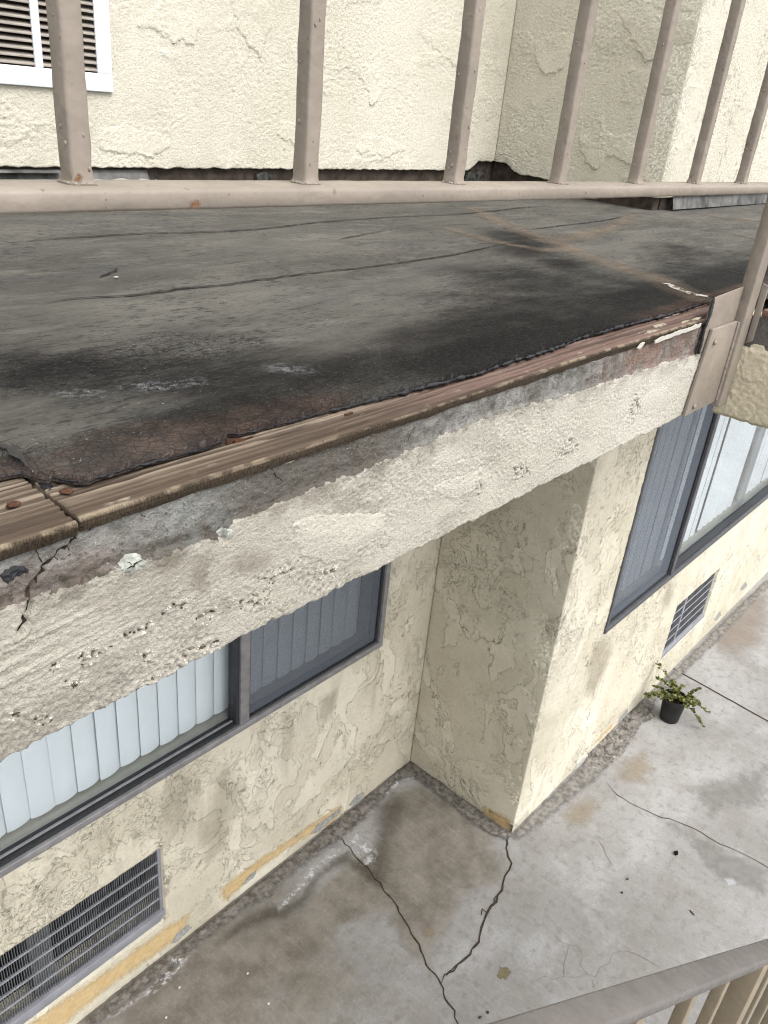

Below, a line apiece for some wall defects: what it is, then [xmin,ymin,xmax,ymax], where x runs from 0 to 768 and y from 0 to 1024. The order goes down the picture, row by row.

peeling [0,313,702,610]
crack [17,529,91,631]
spalling [123,598,196,638]
damp [261,830,380,918]
crack [608,784,768,868]
crack [342,837,512,1024]